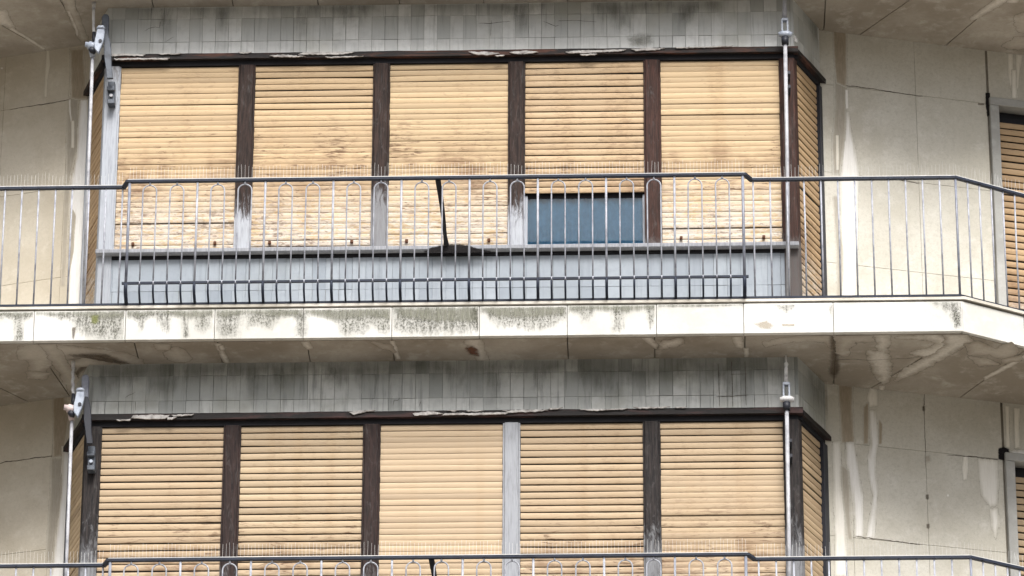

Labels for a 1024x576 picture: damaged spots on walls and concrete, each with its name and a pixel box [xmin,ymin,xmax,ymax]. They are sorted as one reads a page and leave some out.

damp [0,48,731,576]
peeling [413,407,563,416]
damp [759,303,1024,576]